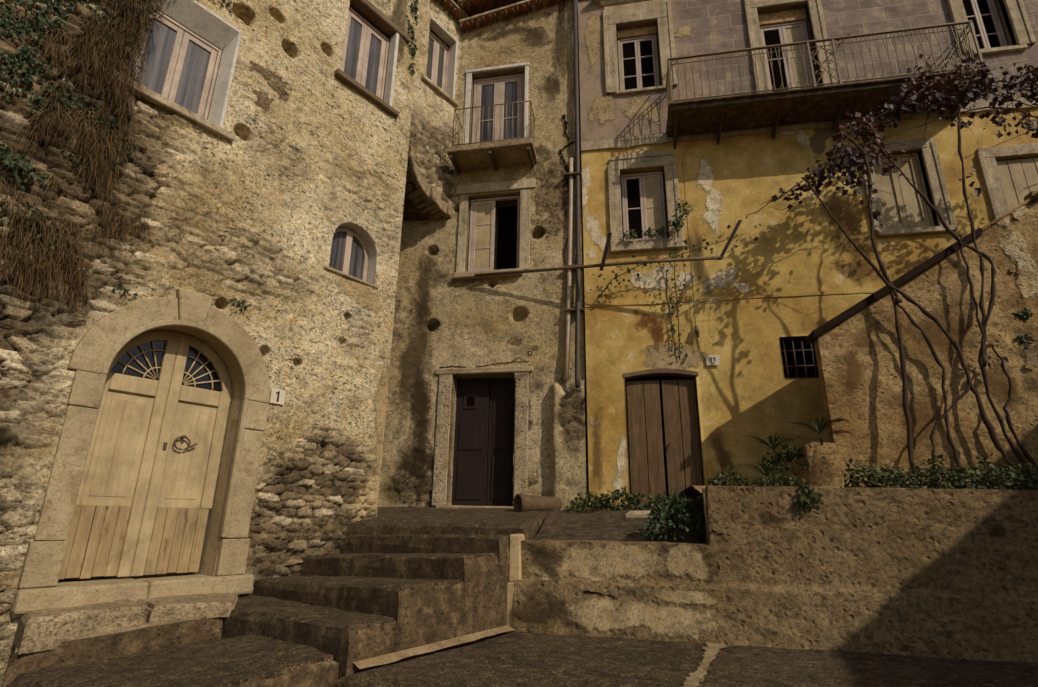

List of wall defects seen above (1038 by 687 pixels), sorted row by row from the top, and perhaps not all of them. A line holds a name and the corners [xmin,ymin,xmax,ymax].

peeling [996,204,1038,299]
leakage [395,258,438,487]